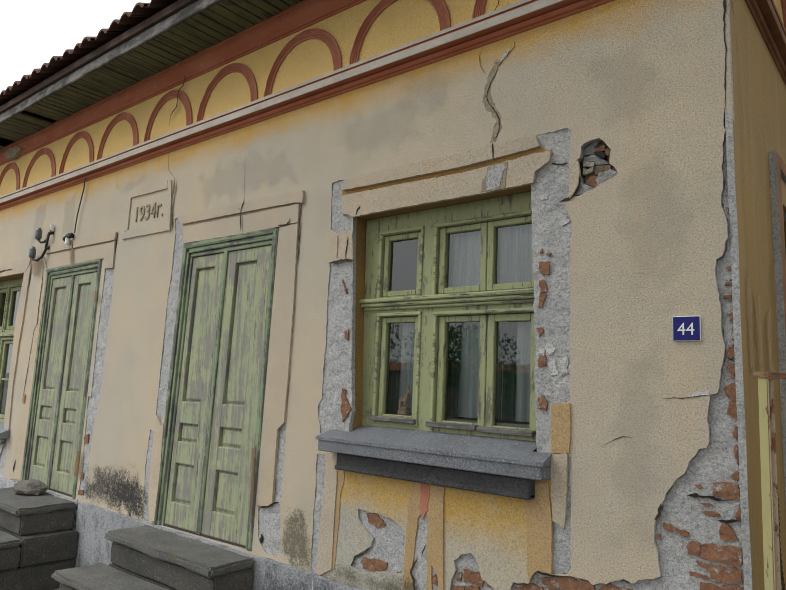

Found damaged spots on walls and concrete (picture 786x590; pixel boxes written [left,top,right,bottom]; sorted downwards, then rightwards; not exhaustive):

crack [479,43,515,156]
flaking render [319,261,356,433]
flaking render [513,129,744,590]
water stain [83,466,147,518]
flaking render [353,509,405,573]
flaking render [412,483,438,590]
flaking render [452,553,494,590]